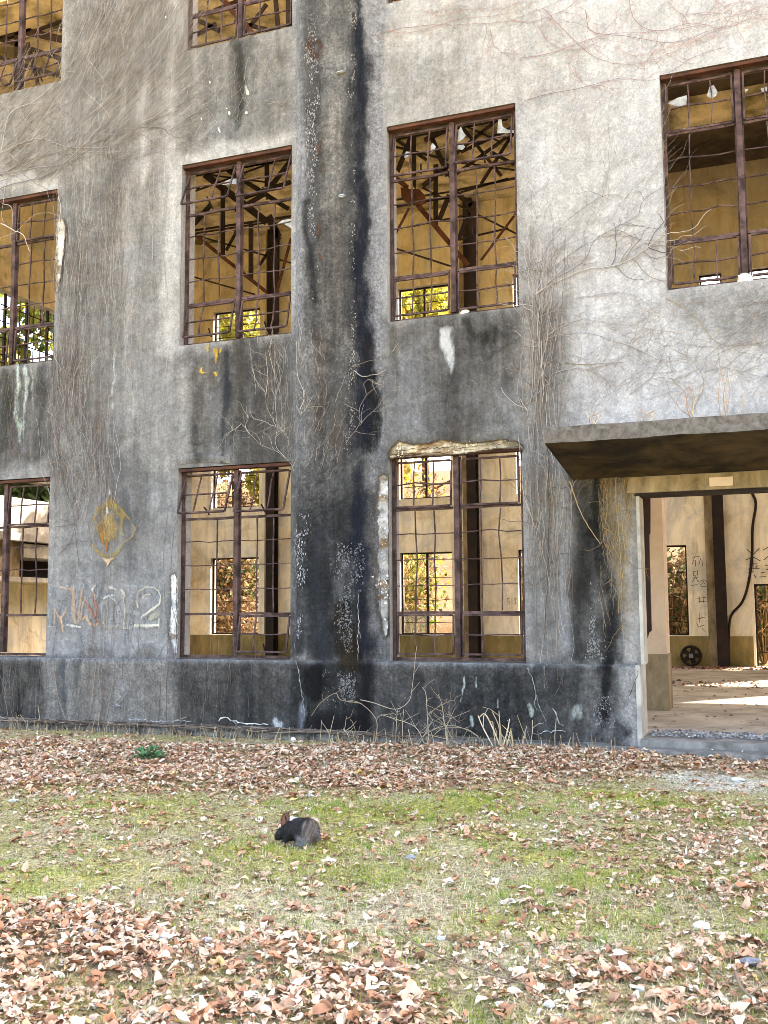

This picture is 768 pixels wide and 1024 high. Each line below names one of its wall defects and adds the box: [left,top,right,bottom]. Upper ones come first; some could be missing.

spalling [56,219,65,291]
water stain [350,0,382,450]
water stain [1,367,43,451]
spalling [387,438,524,460]
spalling [168,573,179,657]
water stain [300,465,376,732]
spalling [330,473,390,653]